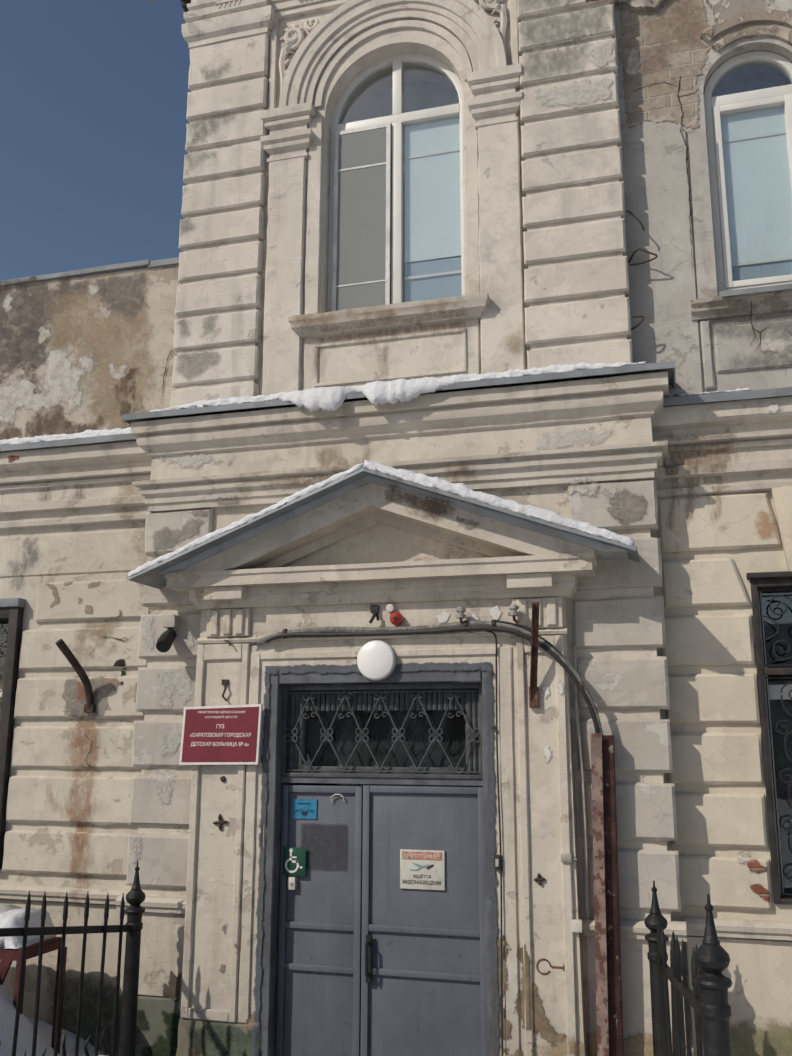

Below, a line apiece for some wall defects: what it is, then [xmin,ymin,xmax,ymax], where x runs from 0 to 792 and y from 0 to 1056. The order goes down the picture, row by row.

peeling [527,0,605,75]
peeling [3,294,13,312]
peeling [88,284,111,319]
peeling [0,327,127,425]
flaking render [153,496,239,556]
flaking render [559,478,647,525]
peeling [47,581,73,608]
flaking render [62,659,137,719]
flaking render [488,935,578,1056]
damp [190,1022,262,1056]